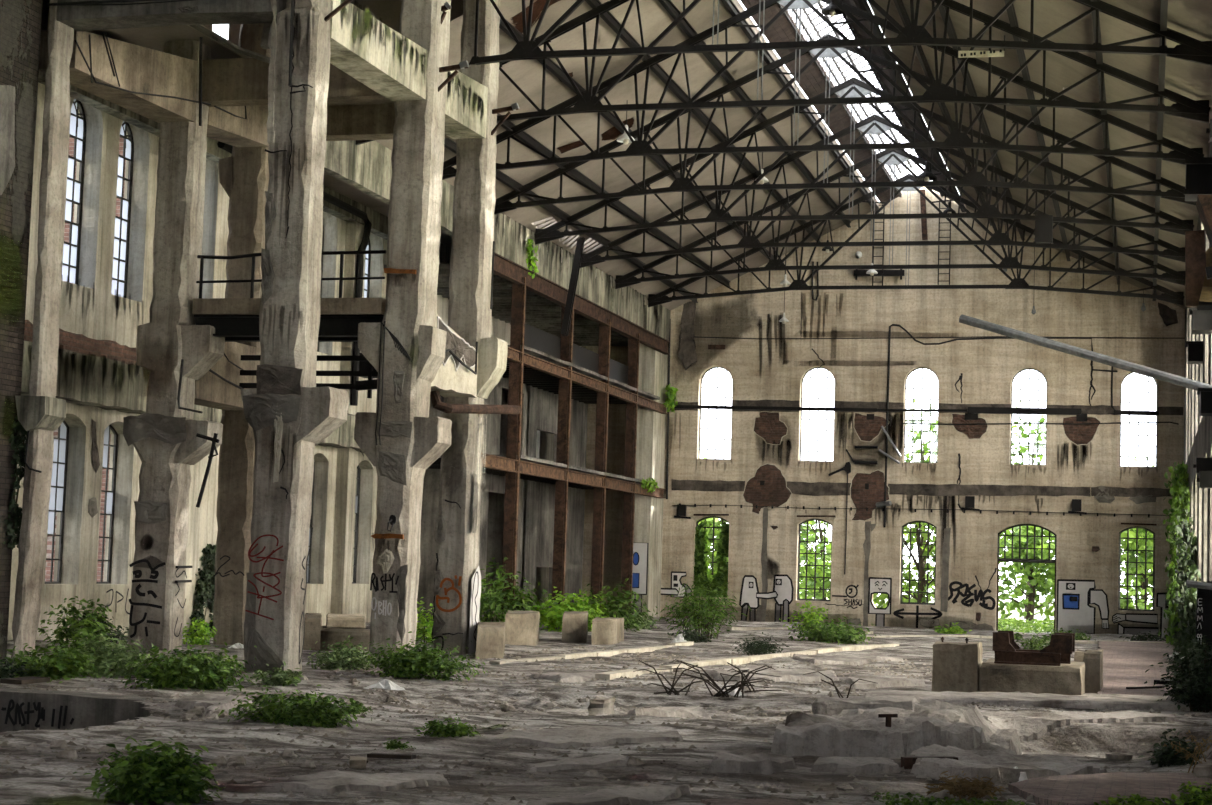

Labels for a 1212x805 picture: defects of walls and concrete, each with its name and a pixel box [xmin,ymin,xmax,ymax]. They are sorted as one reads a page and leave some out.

water stain [342,0,425,78]
flaking render [0,85,16,195]
water stain [678,300,787,374]
water stain [801,294,938,366]